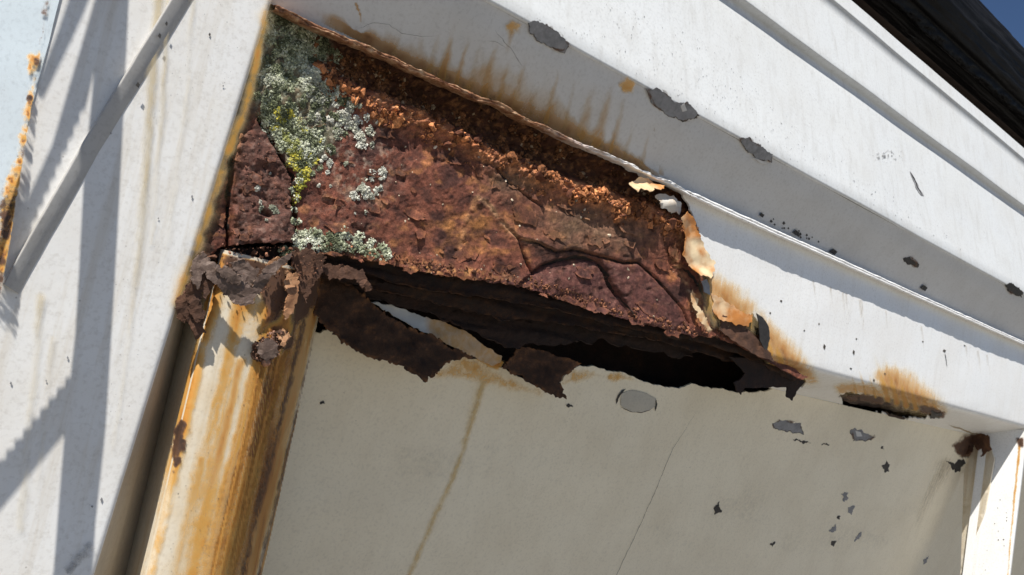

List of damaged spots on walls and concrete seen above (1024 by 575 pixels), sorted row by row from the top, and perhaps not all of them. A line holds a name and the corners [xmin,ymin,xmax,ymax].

peeling [528,20,570,53]
peeling [646,87,699,122]
peeling [740,137,773,165]
corrosion [0,53,40,290]
peeling [629,177,753,331]
corrosion [167,4,813,575]
peeling [616,389,657,413]
corrosion [838,369,945,420]
peeling [772,420,808,444]
peeling [850,428,884,449]
corrosion [953,433,992,458]